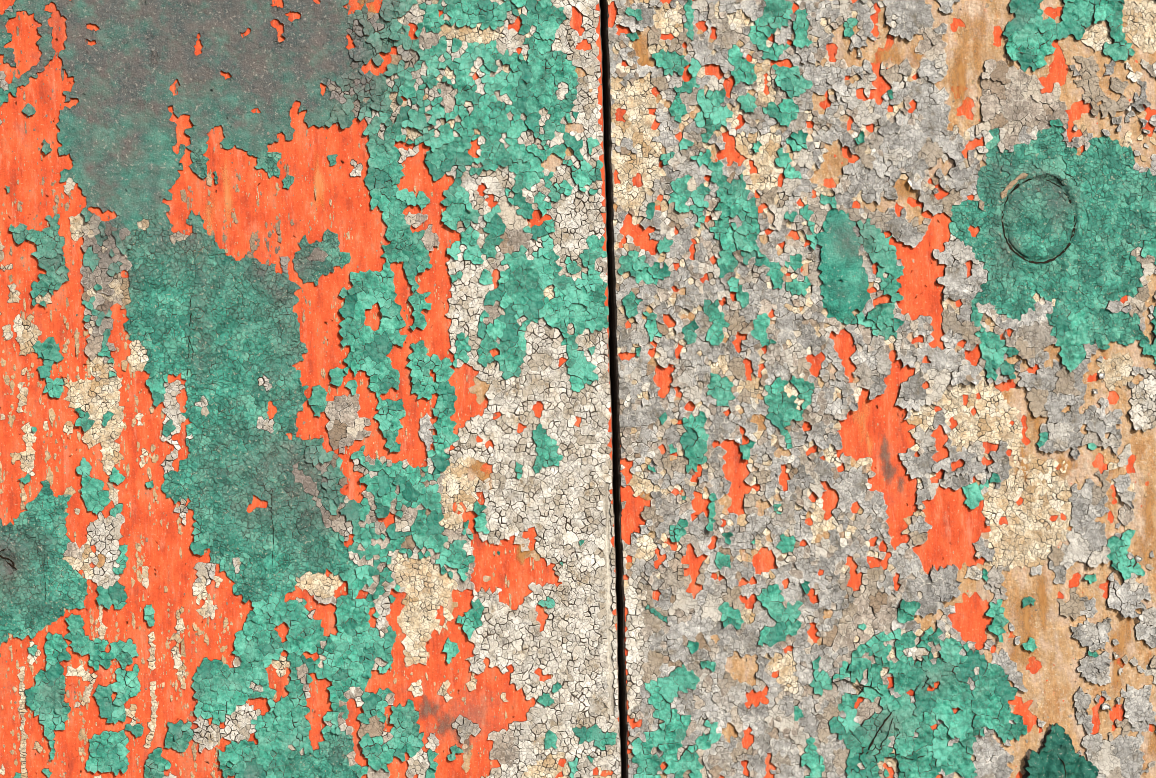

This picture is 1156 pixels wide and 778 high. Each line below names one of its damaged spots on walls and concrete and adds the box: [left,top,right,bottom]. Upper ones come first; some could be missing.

peeling [0,0,621,778]
peeling [608,0,1156,778]